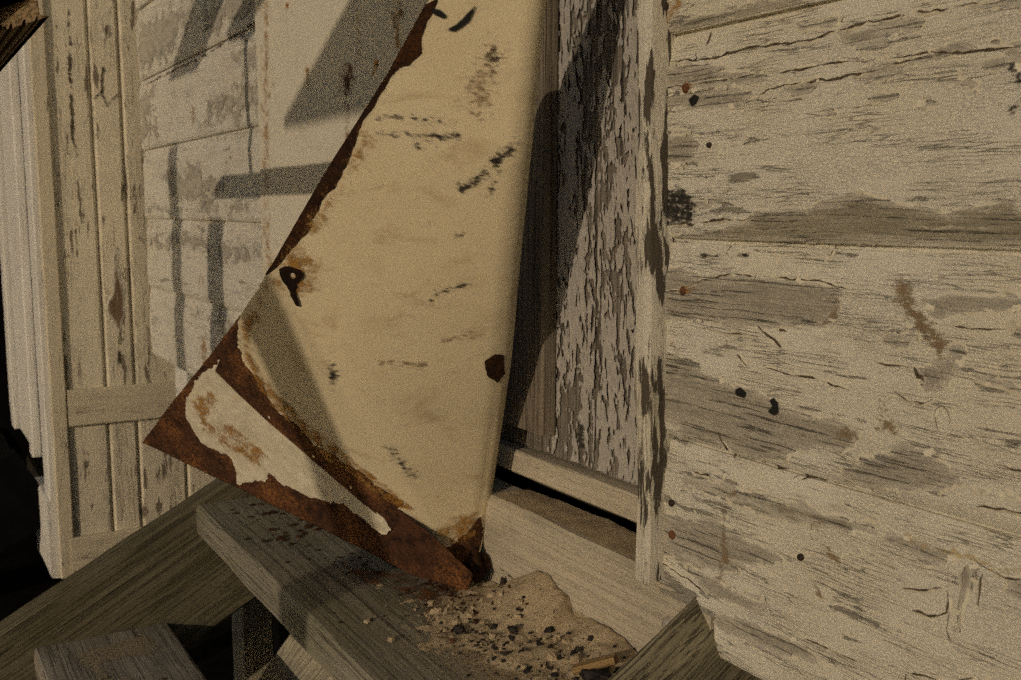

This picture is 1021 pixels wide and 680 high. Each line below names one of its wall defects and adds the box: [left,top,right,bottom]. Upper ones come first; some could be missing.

crack [667,0,1021,94]
corrosion [262,0,437,306]
peeling [547,0,639,485]
peeling [667,190,1021,249]
peeling [666,265,843,333]
corrosion [192,391,263,465]
corrosion [215,298,412,538]
peeling [664,355,965,495]
corrosion [437,512,484,566]
peeling [663,471,980,668]
crack [901,587,952,640]
crack [972,559,1021,605]